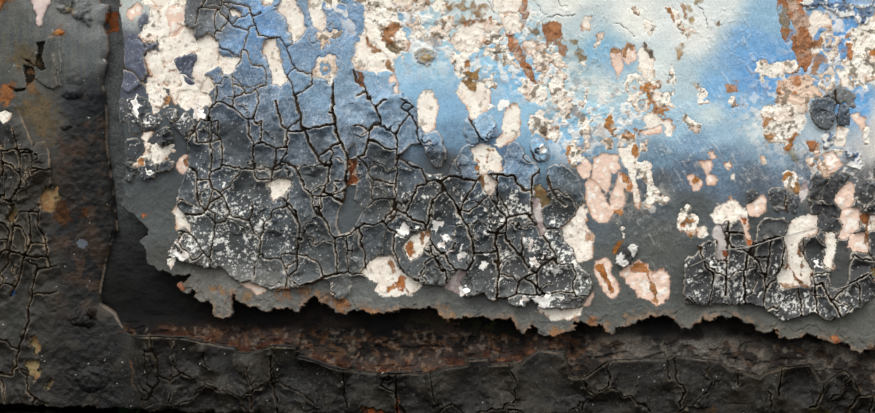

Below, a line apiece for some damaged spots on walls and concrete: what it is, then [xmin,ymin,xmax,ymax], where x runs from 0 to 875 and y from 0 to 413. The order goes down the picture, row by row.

peeling [126,0,240,114]
rust [506,32,538,84]
rust [518,0,587,62]
rust [776,0,828,94]
peeling [753,0,875,152]
crack [118,0,593,310]
peeling [352,0,702,322]
crack [0,103,71,408]
peeling [676,195,767,260]
crack [682,161,875,321]
peeling [776,182,875,289]
crack [129,336,875,413]